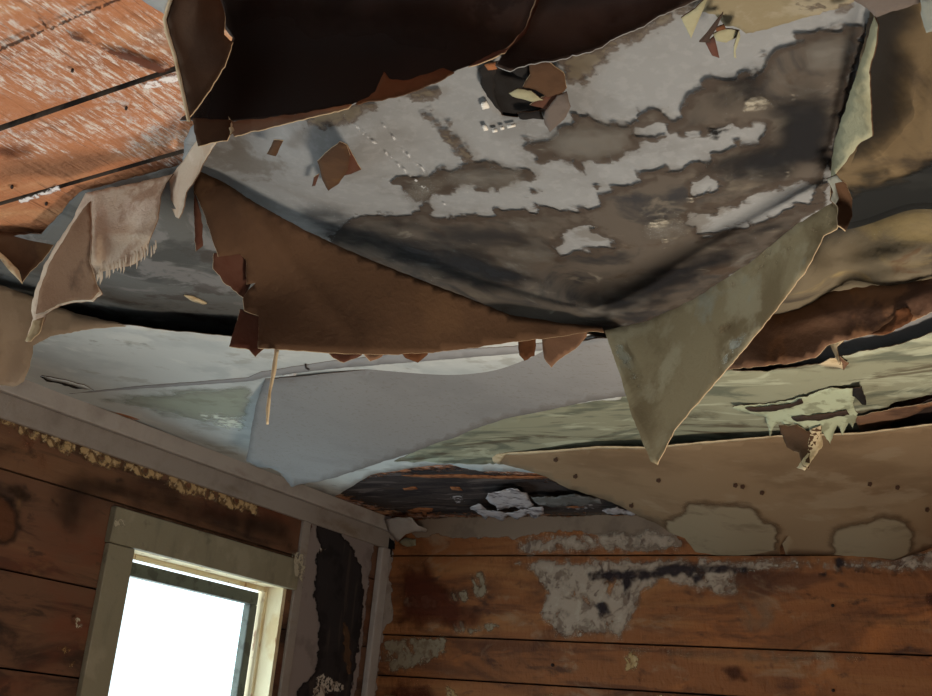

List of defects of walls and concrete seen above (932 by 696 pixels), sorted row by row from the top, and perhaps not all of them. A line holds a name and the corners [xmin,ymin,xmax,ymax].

spalling [70,34,169,73]
leakage [306,2,915,337]
peeling [18,425,258,515]
peeling [292,526,364,696]